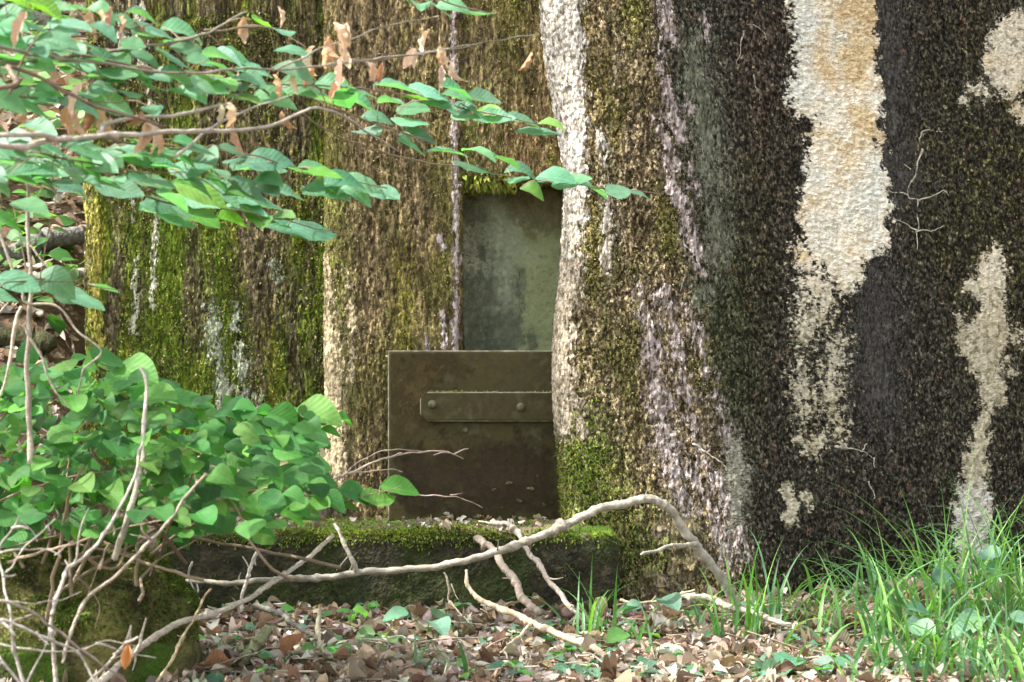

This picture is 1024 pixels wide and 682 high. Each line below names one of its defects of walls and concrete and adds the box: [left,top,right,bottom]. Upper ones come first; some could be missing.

leakage [128,213,160,335]
leakage [264,256,287,291]
leakage [199,299,266,419]